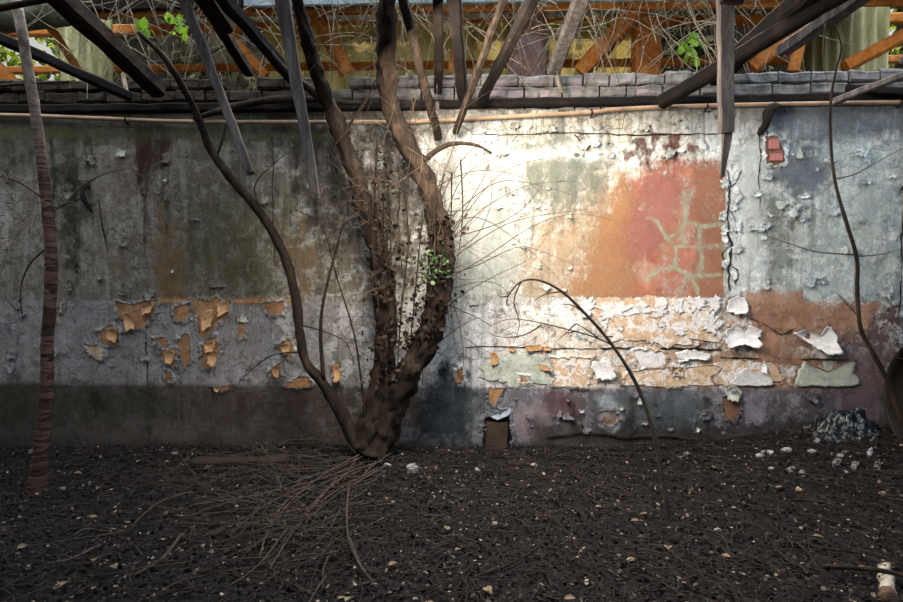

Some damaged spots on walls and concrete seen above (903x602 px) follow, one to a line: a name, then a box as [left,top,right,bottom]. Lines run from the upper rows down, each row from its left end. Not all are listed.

damp [129,125,199,222]
rust [522,132,725,298]
crack [645,127,762,295]
flaking render [752,130,805,198]
peeling [748,189,815,240]
peeling [825,191,841,217]
flaking render [266,334,316,392]
flaking render [328,357,346,386]
damp [419,362,476,448]
damp [514,391,807,447]
flaking render [453,275,895,447]